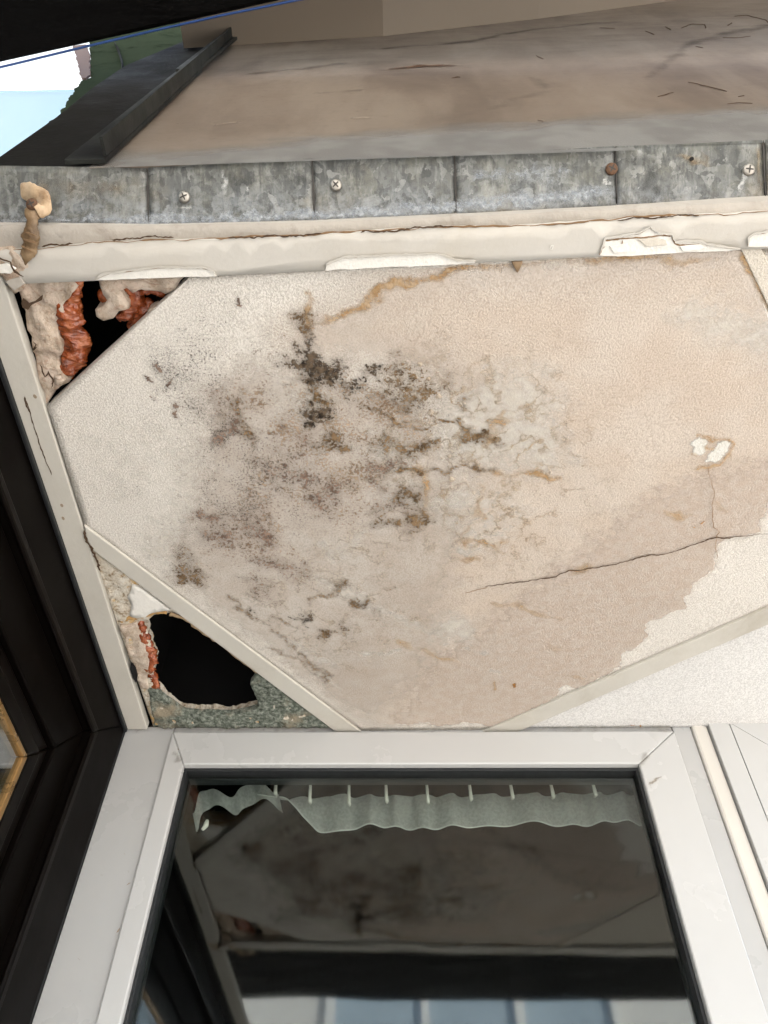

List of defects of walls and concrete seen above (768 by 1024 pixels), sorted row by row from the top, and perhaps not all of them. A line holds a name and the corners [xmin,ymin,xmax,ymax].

peeling [325,253,476,271]
peeling [599,226,768,256]
spalling [0,246,217,403]
spalling [691,436,735,470]
water stain [166,255,768,726]
crack [467,468,757,593]
flaking render [128,583,171,619]
rust [119,611,257,673]